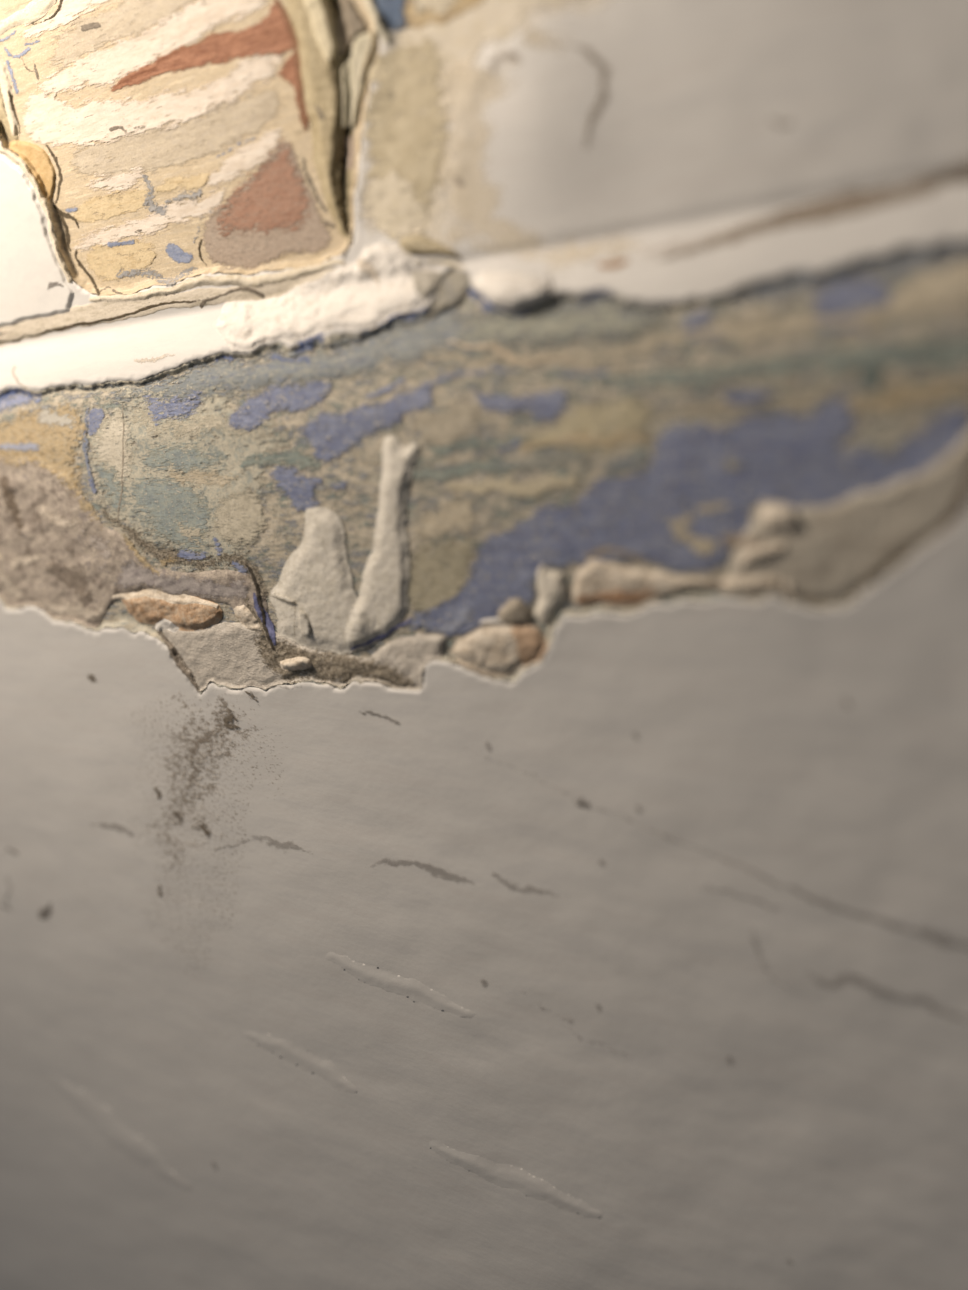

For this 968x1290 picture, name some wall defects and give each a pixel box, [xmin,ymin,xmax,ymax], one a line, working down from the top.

crack [490,52,520,72]
crack [555,44,609,147]
peeling [0,0,968,694]
crack [577,798,590,808]